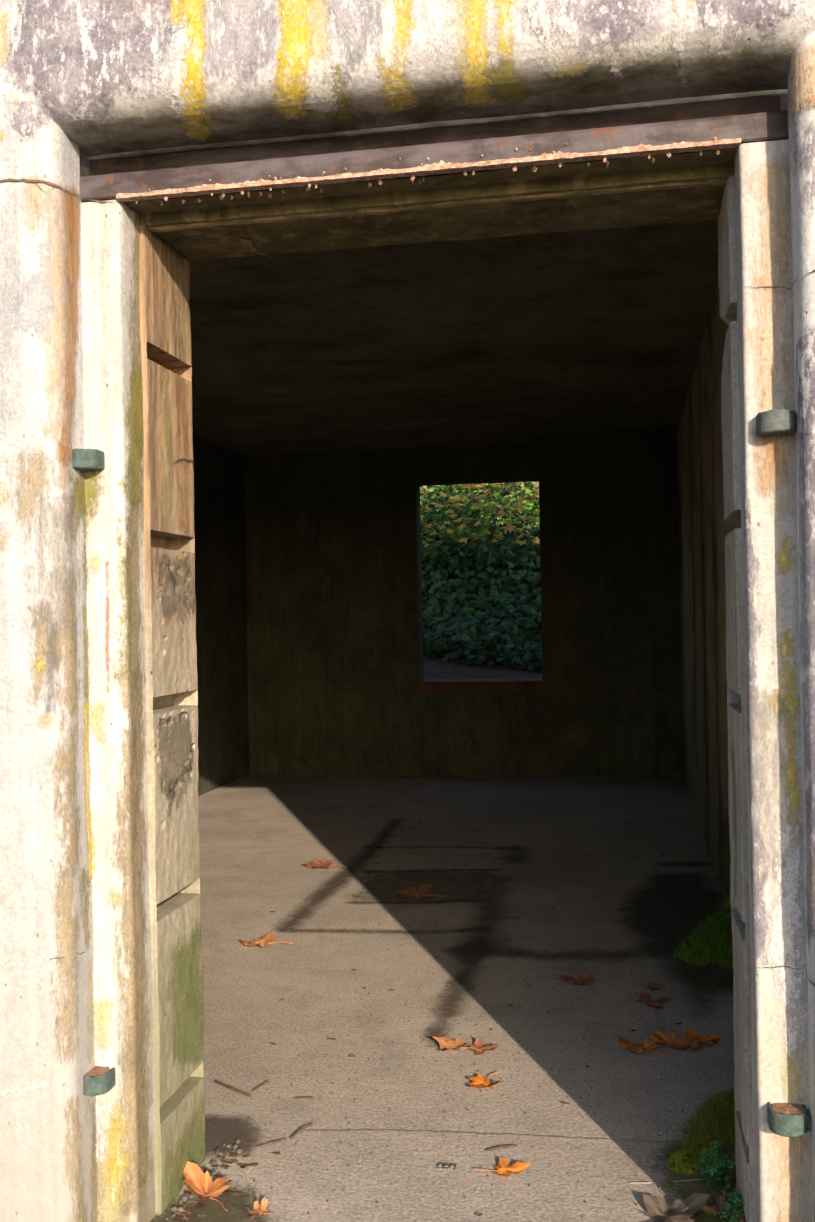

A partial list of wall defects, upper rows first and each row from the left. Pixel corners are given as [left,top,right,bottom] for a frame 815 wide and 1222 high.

rust [789,44,815,113]
crack [746,269,815,289]
water stain [281,819,736,1040]